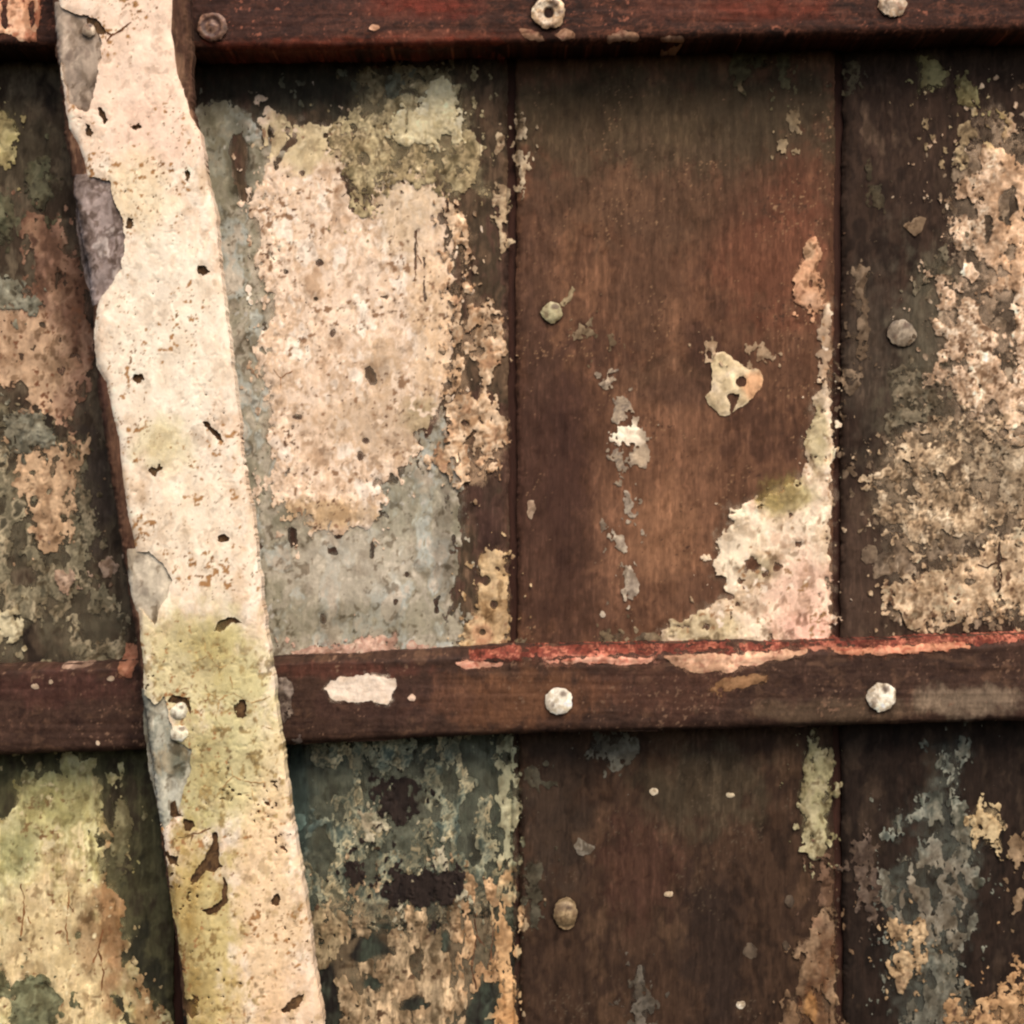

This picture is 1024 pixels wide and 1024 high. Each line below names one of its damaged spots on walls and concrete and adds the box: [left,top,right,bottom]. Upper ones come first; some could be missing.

peeling [55,1,108,137]
peeling [0,101,172,681]
peeling [195,49,1024,697]
peeling [278,677,294,723]
peeling [0,688,195,1024]
peeling [281,994,304,1013]
peeling [286,734,560,1024]
peeling [743,943,757,959]
peeling [765,722,1024,1024]